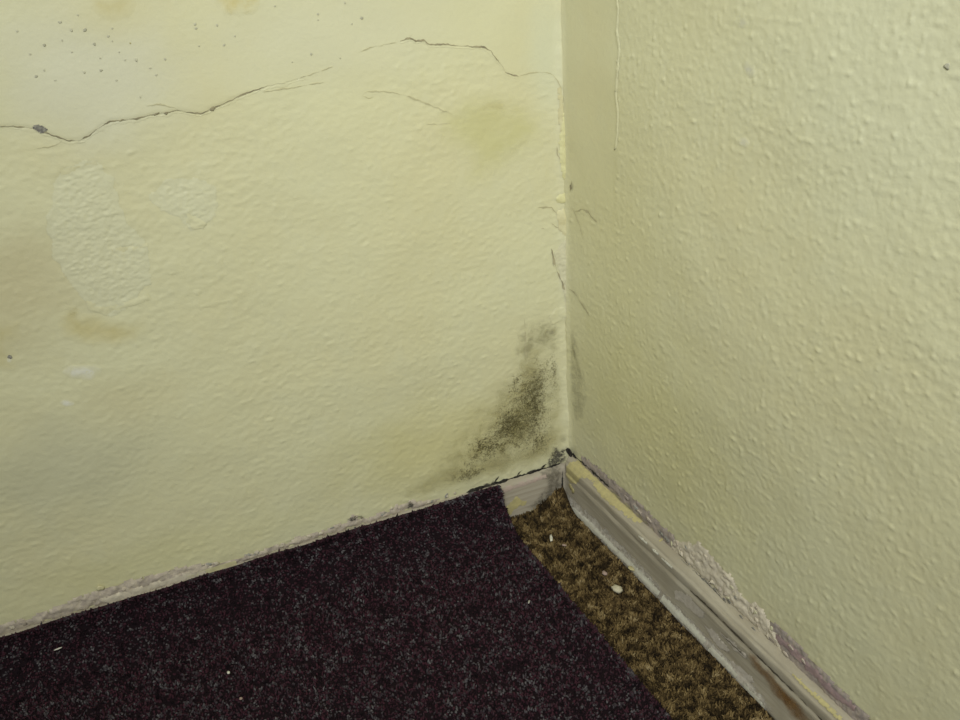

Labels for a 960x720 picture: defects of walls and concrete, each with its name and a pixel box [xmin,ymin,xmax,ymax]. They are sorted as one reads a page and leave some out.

crack [363,37,562,91]
crack [0,67,331,149]
crack [363,90,451,125]
crack [539,180,596,313]
water stain [548,448,565,466]
peeling [566,456,870,720]